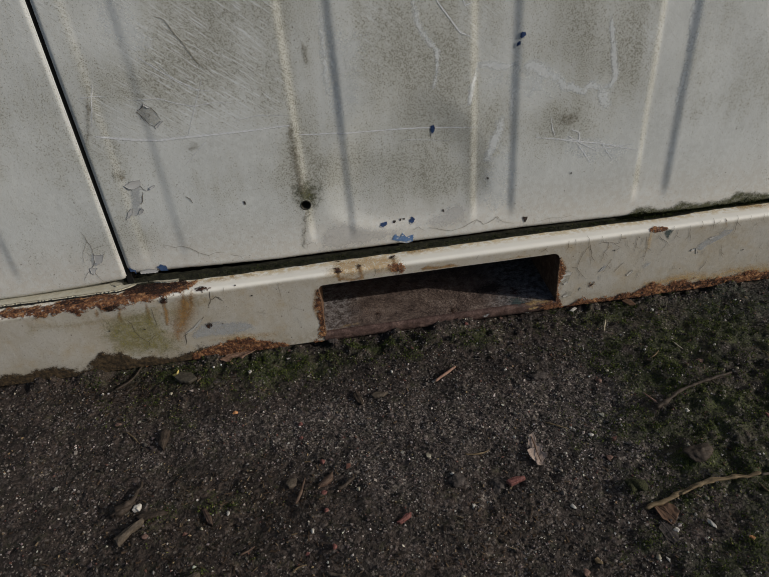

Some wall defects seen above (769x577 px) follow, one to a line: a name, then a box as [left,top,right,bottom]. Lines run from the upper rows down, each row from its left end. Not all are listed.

corrosion [0,279,211,339]
corrosion [314,289,326,343]
corrosion [333,255,406,281]
corrosion [530,260,769,310]
crack [568,216,766,279]
corrosion [192,336,290,360]